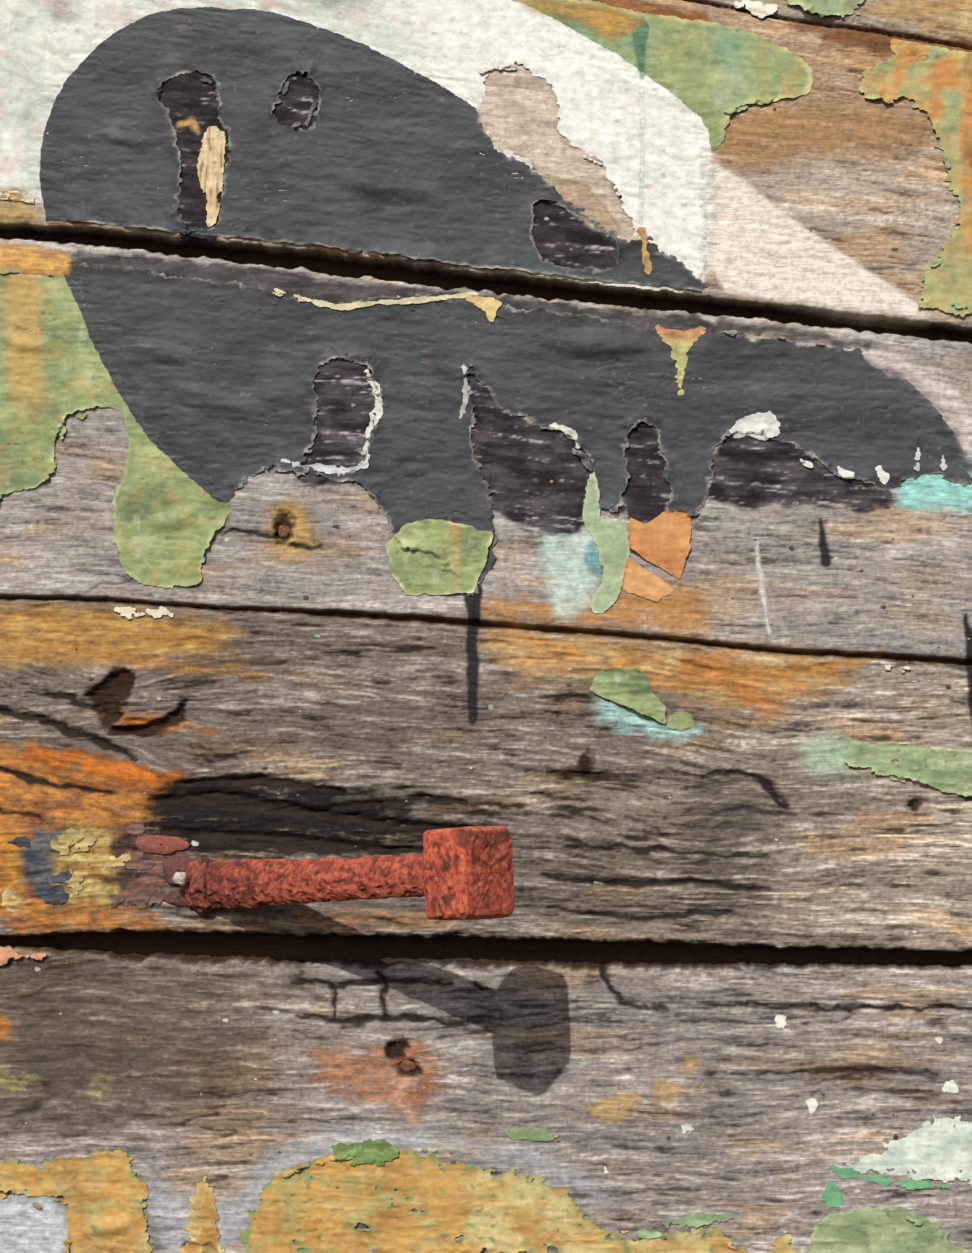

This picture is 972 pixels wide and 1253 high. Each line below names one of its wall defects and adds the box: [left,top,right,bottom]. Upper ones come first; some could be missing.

peeling [786,0,864,18]
peeling [0,0,813,293]
peeling [858,39,972,318]
peeling [0,261,972,613]
peeling [590,667,694,731]
peeling [844,740,972,797]
peeling [775,1015,786,1029]
peeling [942,1080,959,1094]
peeling [0,1148,153,1253]
peeling [179,1176,225,1253]
peeling [239,1139,748,1253]
peeling [768,1116,972,1253]